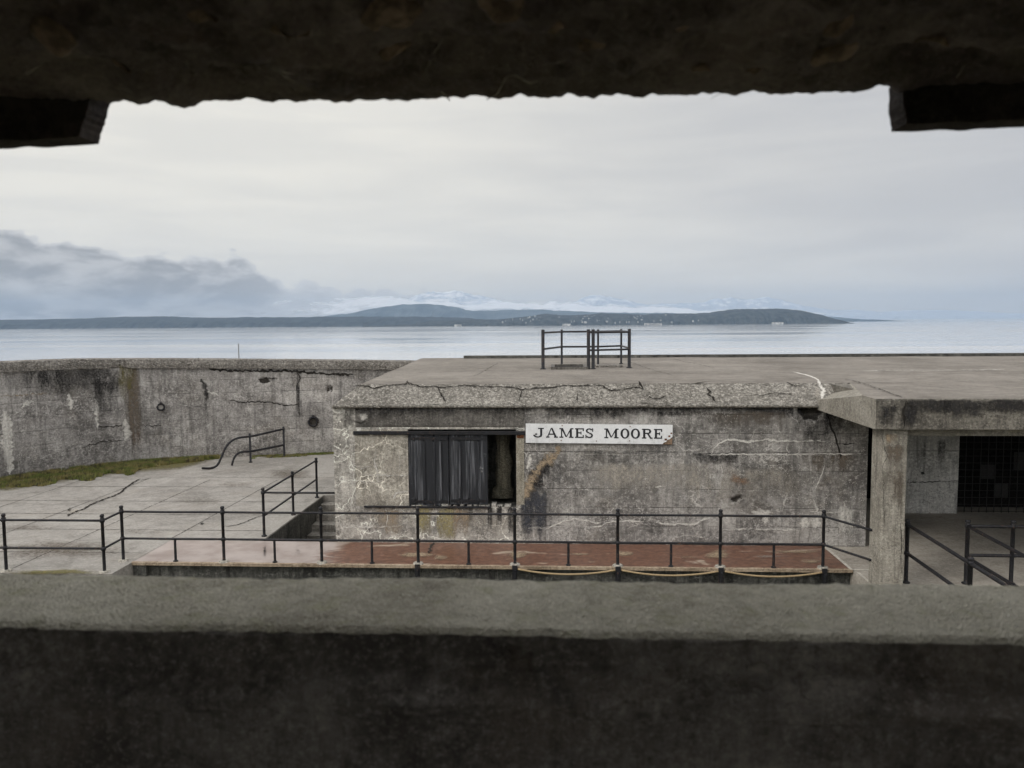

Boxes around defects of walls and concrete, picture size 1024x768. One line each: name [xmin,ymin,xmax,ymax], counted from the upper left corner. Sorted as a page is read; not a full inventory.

leakage [25,367,141,444]
crack [82,424,161,448]
crack [198,358,715,429]
crack [819,413,854,458]
leakage [488,454,641,534]
leakage [656,518,710,538]